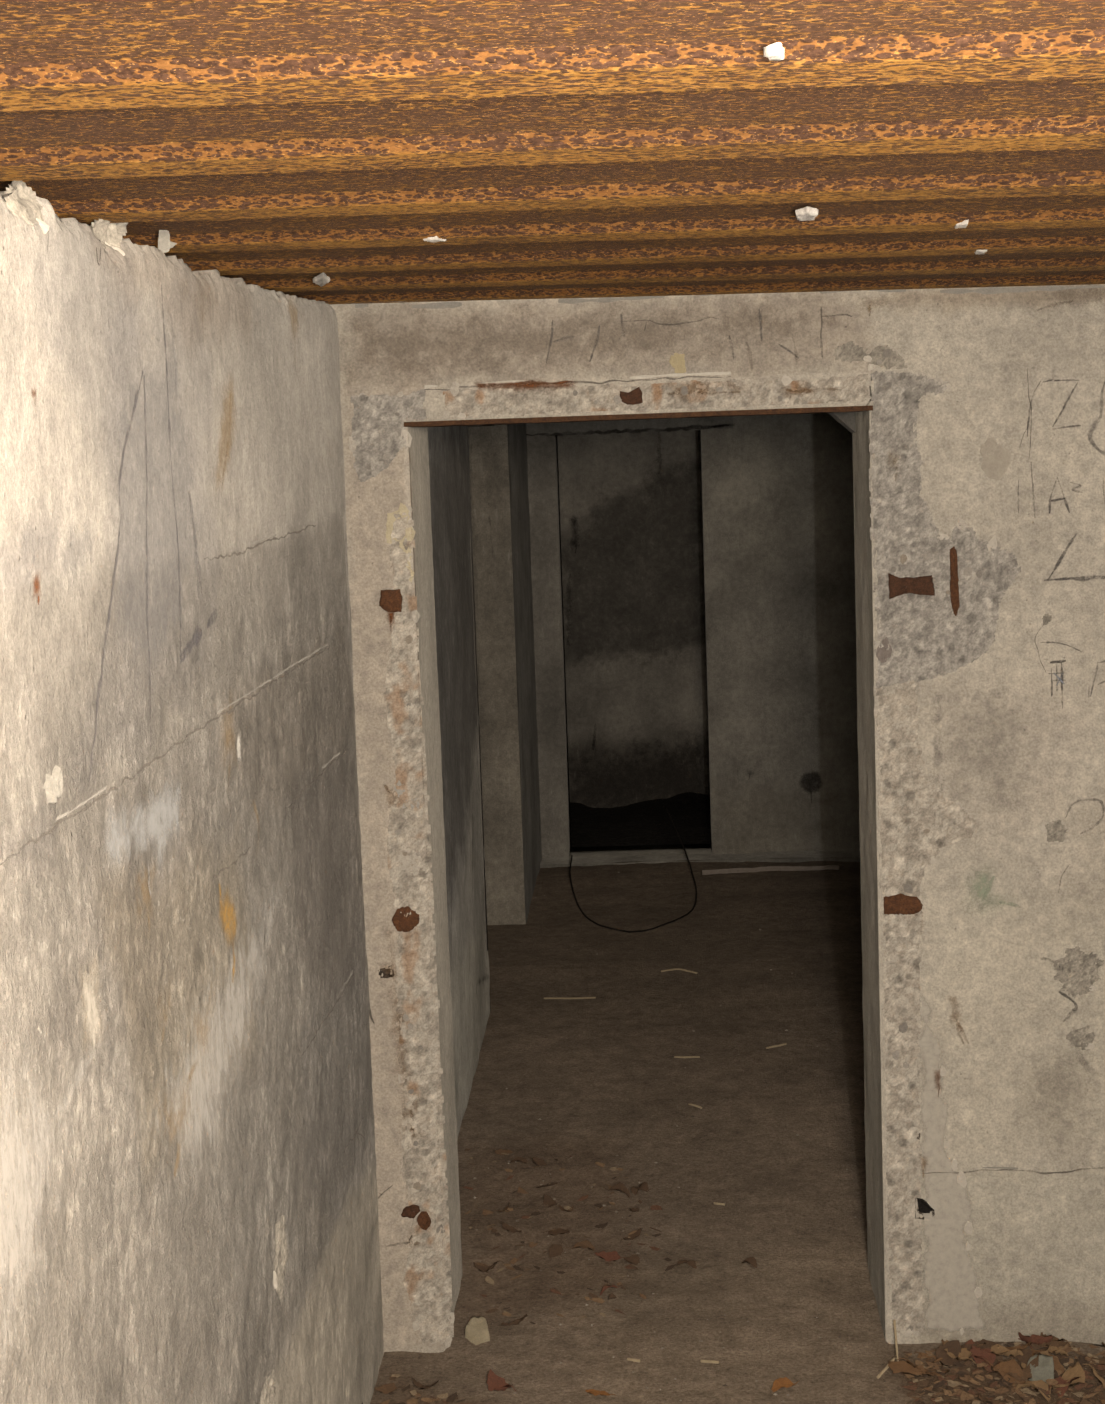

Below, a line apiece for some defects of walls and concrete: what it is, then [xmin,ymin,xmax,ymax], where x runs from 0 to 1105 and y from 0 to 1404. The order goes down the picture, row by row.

corrosion [477,381,571,390]
corrosion [950,547,960,616]
crack [194,646,330,732]
crack [1,751,168,865]
spalling [348,341,1021,1349]